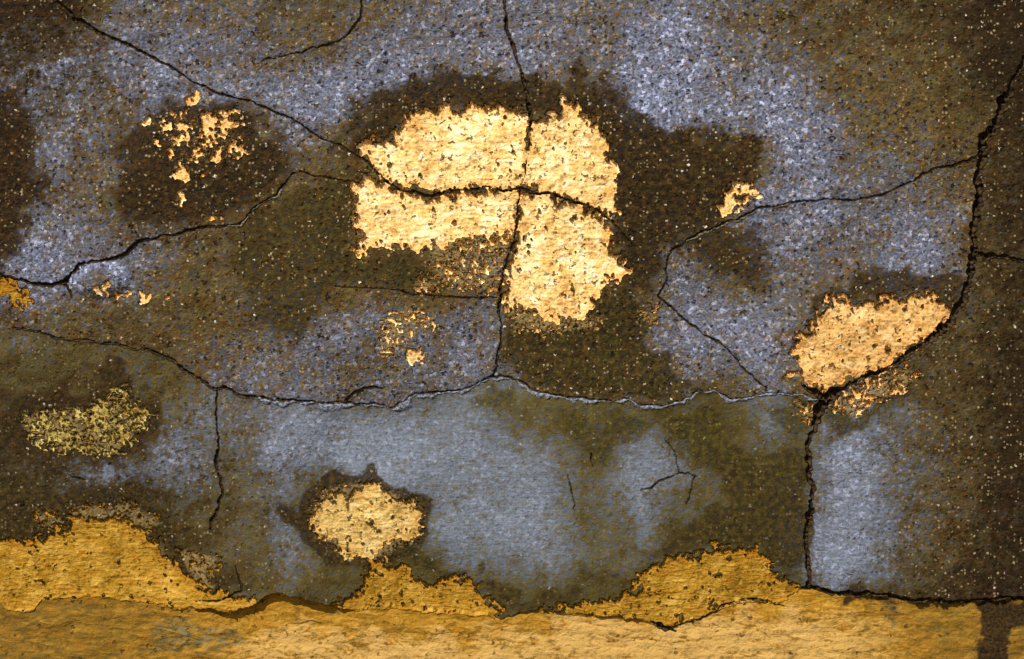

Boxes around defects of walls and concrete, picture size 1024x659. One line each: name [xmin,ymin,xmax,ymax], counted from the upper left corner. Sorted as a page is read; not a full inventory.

spalling [141,89,250,207]
crack [0,0,820,529]
spalling [349,95,633,366]
leakage [463,368,525,414]
spalling [712,181,762,218]
crack [657,56,1024,604]
spalling [785,289,951,421]
spalling [0,499,257,613]
crack [196,565,242,602]
spalling [307,480,505,618]
leakage [273,379,932,622]
spalling [539,540,801,627]